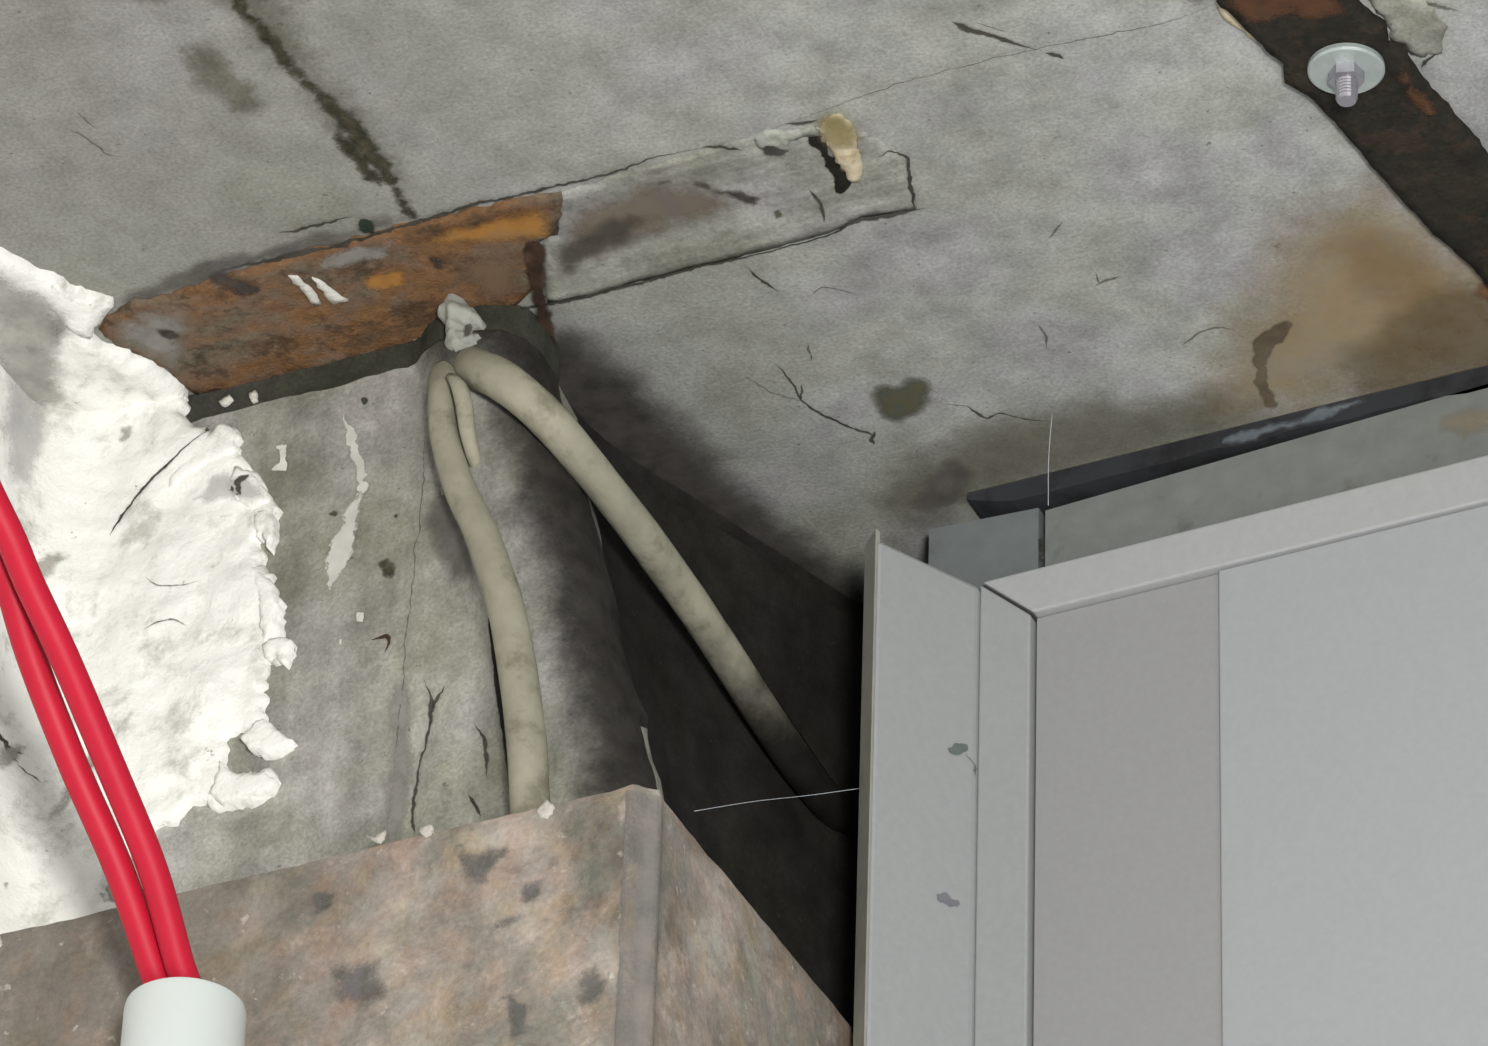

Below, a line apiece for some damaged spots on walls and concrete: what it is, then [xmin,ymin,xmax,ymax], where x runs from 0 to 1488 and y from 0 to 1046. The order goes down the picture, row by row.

spalling [1369,0,1459,67]
damp [334,126,383,186]
spalling [754,125,851,194]
crack [221,145,739,271]
rust [366,272,403,290]
rust [437,214,555,345]
rust [1241,220,1488,391]
crack [750,344,876,444]
damp [874,379,929,420]
damp [1253,321,1292,407]
crack [387,403,445,833]
crack [0,734,40,782]